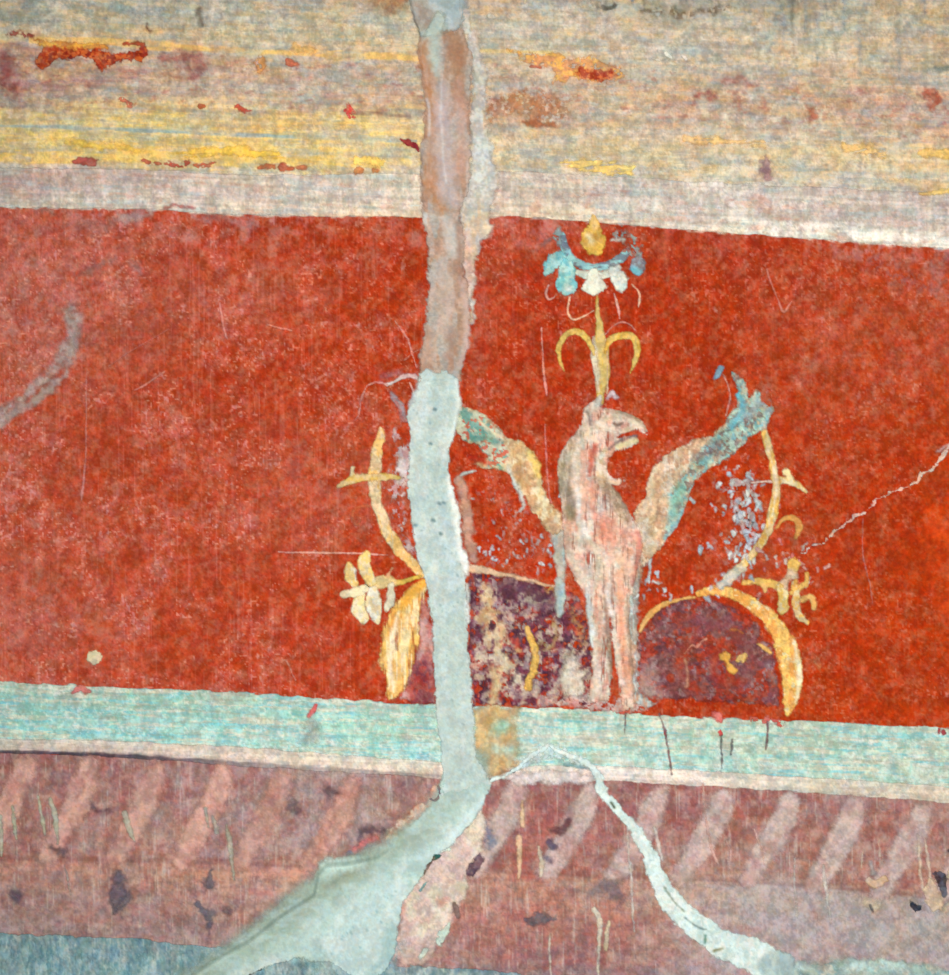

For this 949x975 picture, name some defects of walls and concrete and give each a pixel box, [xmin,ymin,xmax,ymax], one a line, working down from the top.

peeling [10,31,148,72]
peeling [160,54,206,79]
peeling [486,49,624,127]
peeling [924,89,941,109]
crack [183,0,799,975]
crack [802,444,949,554]